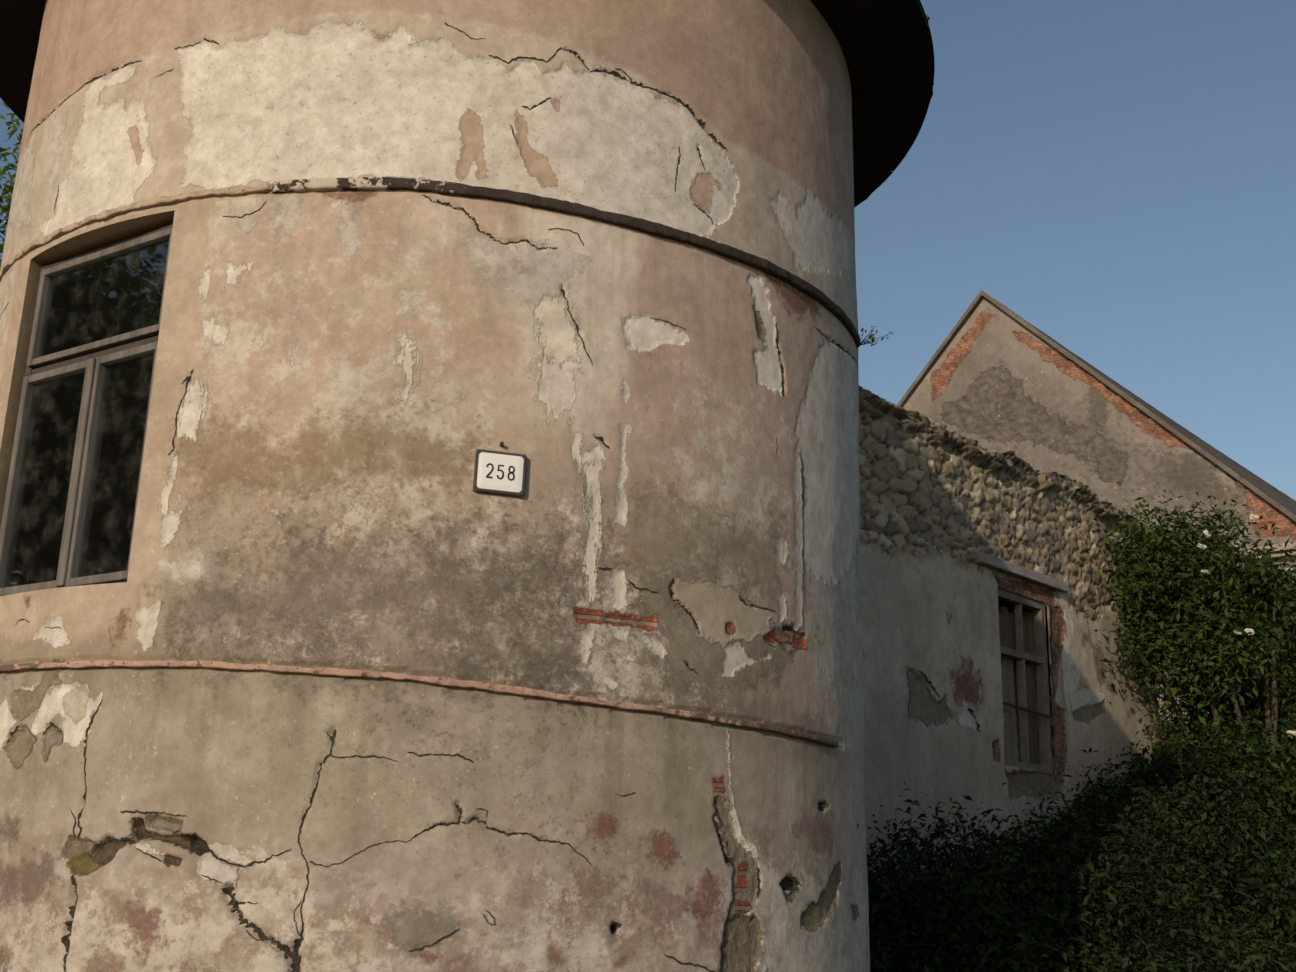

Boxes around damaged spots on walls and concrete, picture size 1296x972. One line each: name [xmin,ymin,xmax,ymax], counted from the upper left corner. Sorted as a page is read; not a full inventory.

flaking render [8,63,157,236]
crack [26,38,219,147]
crack [223,201,267,218]
flaking render [177,18,741,239]
flaking render [135,377,212,653]
flaking render [454,222,860,696]
flaking render [0,616,105,769]
crack [61,874,78,972]
crack [70,694,104,840]
crack [120,810,189,833]
crack [208,729,591,972]
spalling [712,728,767,972]